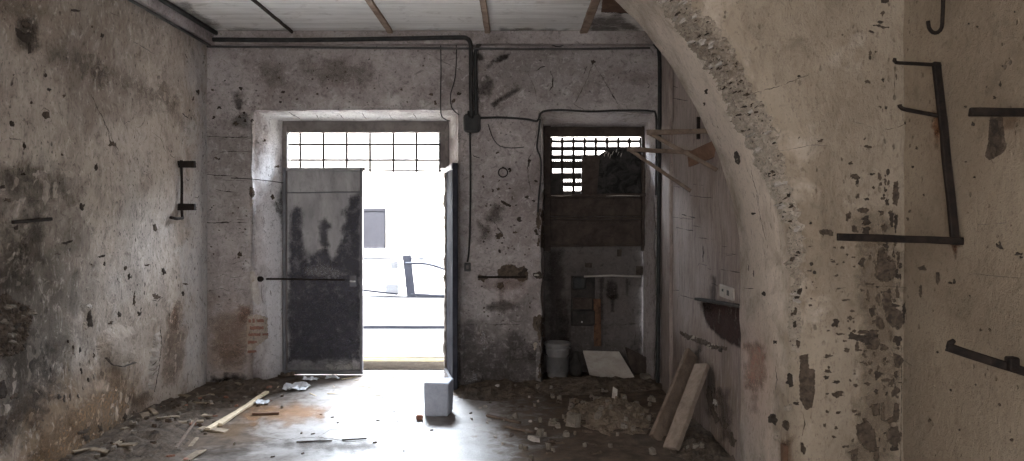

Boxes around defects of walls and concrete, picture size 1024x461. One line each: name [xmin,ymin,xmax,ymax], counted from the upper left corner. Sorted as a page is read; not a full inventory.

water stain [0,342,47,449]
flaking render [234,251,271,353]
flaking render [478,180,545,378]
spalling [655,0,911,461]